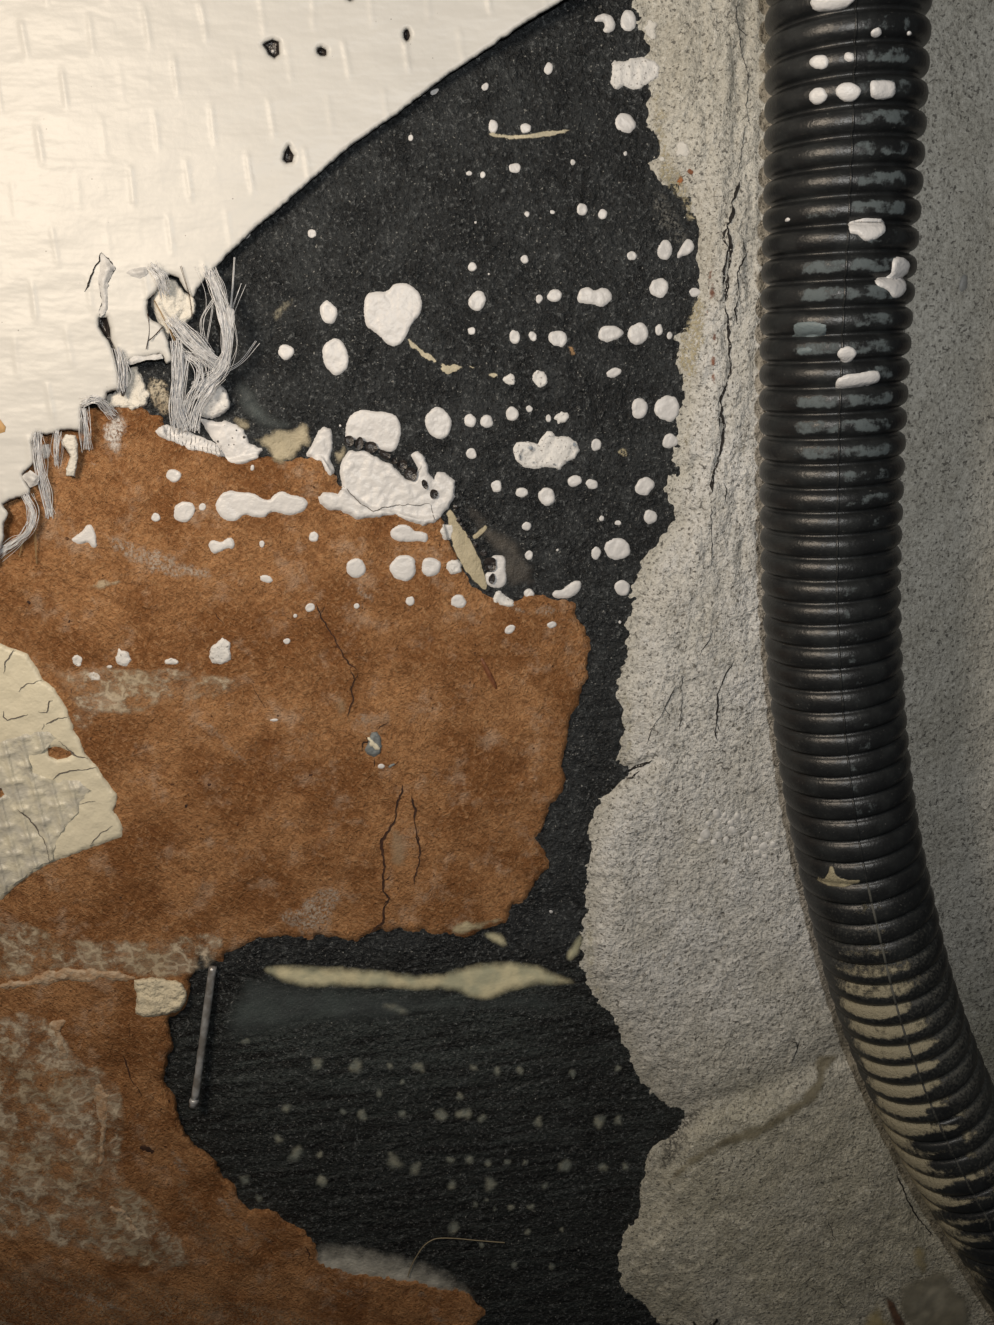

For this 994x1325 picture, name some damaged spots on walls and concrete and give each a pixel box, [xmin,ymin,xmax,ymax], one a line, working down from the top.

crack [709,0,752,568]
peeling [156,419,263,464]
peeling [306,427,496,584]
crack [316,605,421,933]
peeling [0,967,135,990]
peeling [49,1019,68,1059]
peeling [93,1084,109,1164]